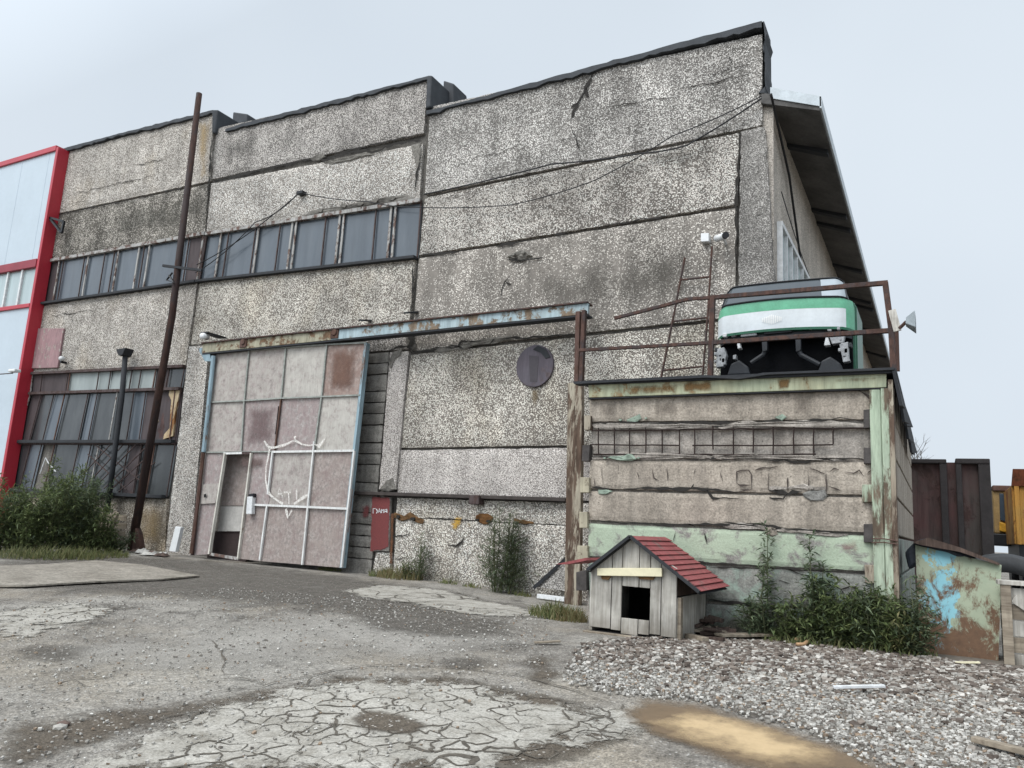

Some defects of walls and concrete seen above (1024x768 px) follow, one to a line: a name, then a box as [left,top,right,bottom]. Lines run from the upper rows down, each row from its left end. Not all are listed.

crack [560,52,760,150]
rust [333,354,352,386]
rust [475,513,493,525]